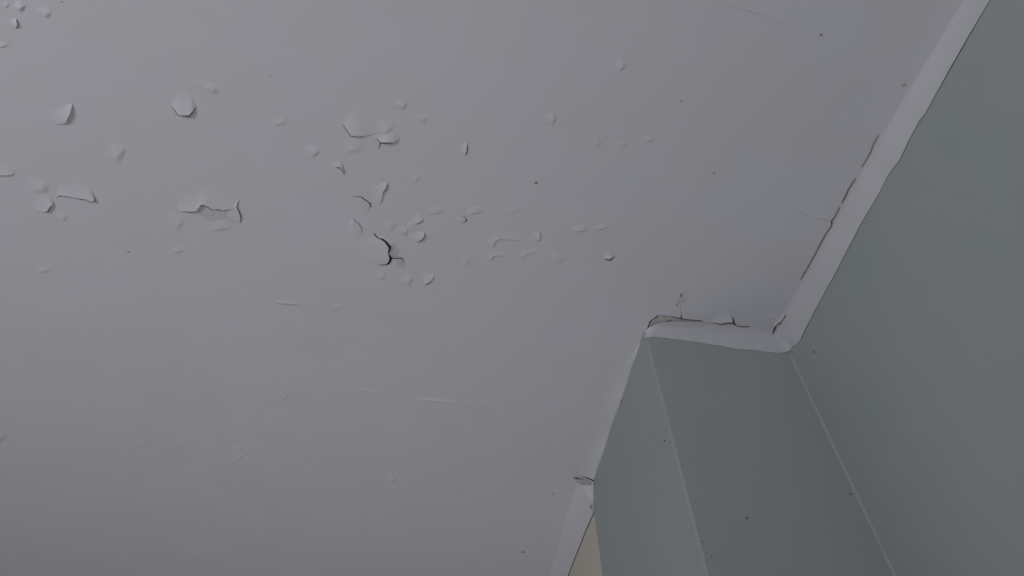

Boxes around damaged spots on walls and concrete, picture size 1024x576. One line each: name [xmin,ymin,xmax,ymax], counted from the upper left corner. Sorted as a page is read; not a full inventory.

peeling [46,103,72,126]
peeling [178,185,241,224]
crack [347,196,406,269]
crack [801,134,879,278]